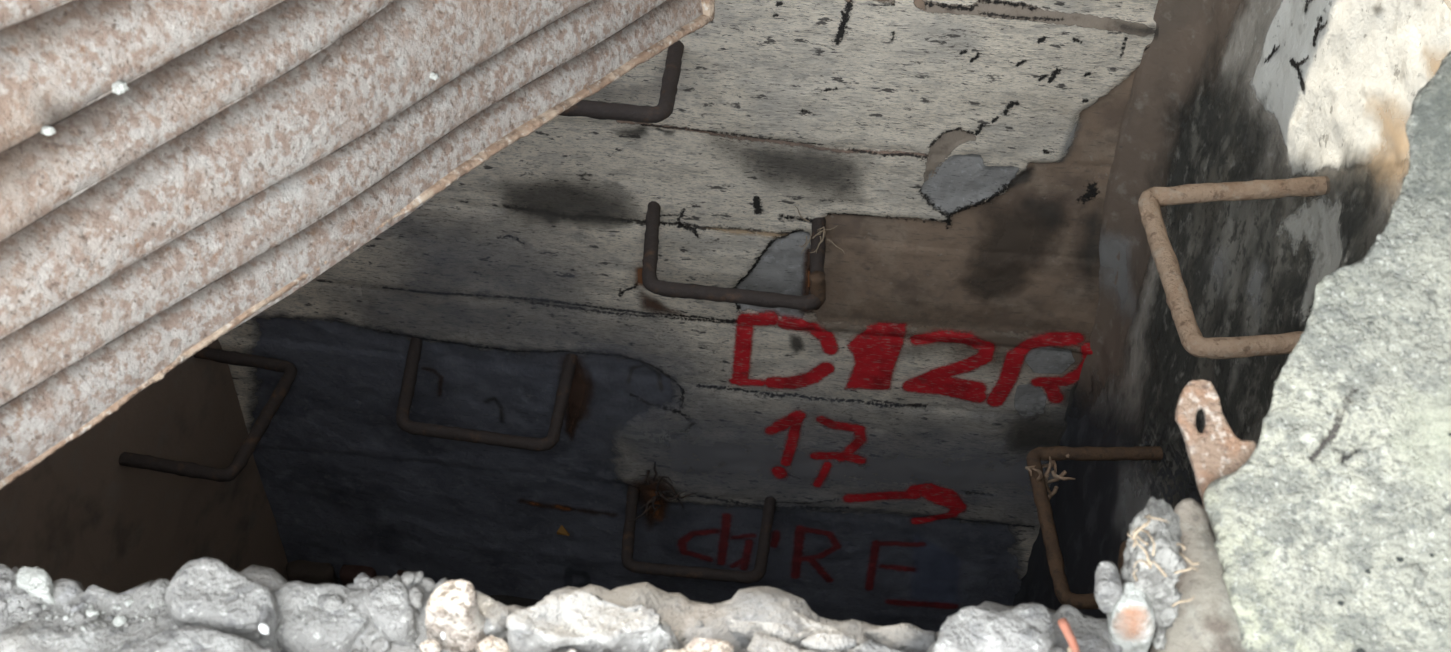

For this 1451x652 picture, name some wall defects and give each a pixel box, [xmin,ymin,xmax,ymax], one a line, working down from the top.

peeling [1252,0,1451,182]
peeling [734,0,1246,419]
rust [636,267,676,313]
rust [801,249,811,313]
rust [563,360,592,439]